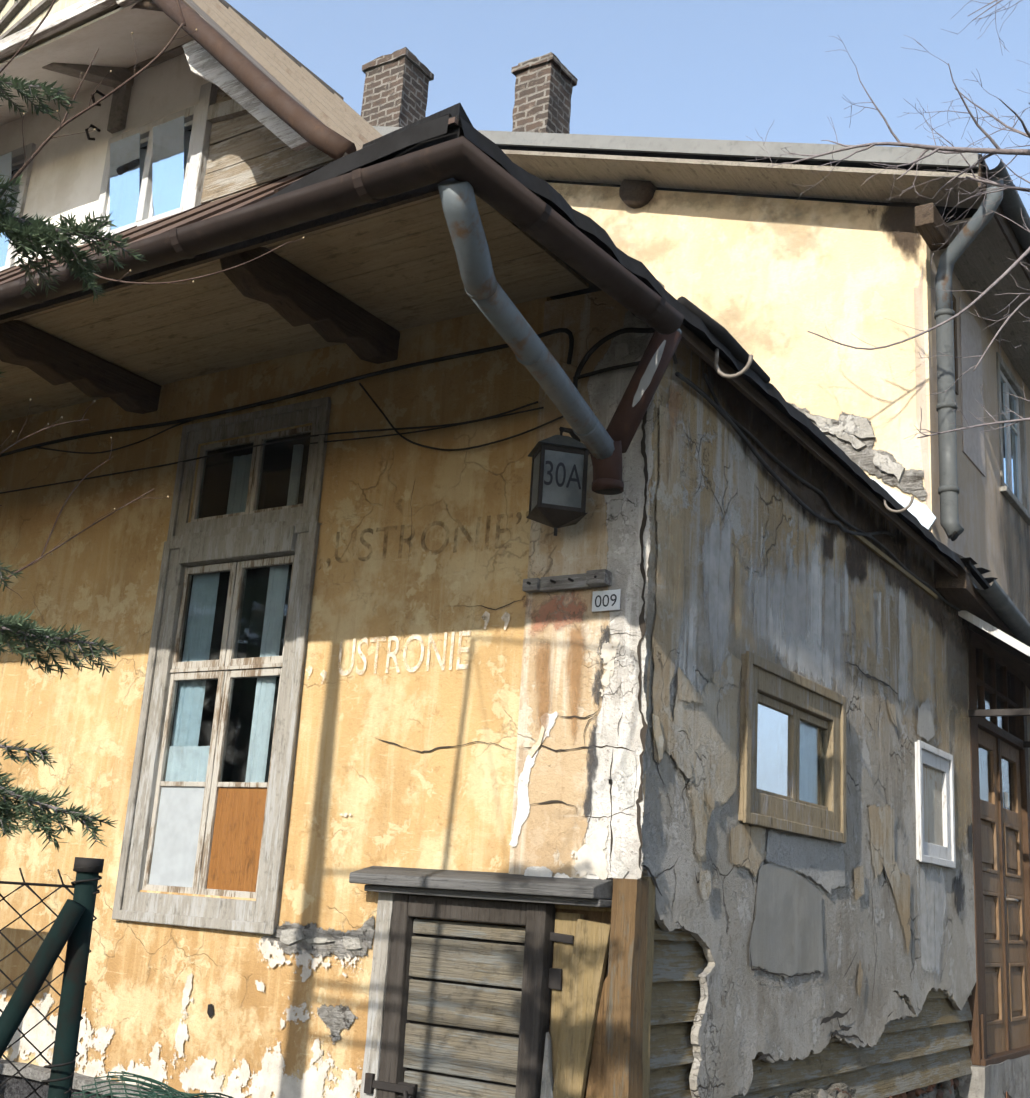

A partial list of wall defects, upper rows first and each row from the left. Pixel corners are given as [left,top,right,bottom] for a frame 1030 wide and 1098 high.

leakage [868,202,921,257]
spalling [788,402,927,502]
crack [376,410,662,896]
peeling [524,311,742,902]
crack [846,661,901,749]
peeling [509,712,558,847]
peeling [729,804,911,956]
spalling [256,916,375,982]
flaking render [280,995,358,1044]